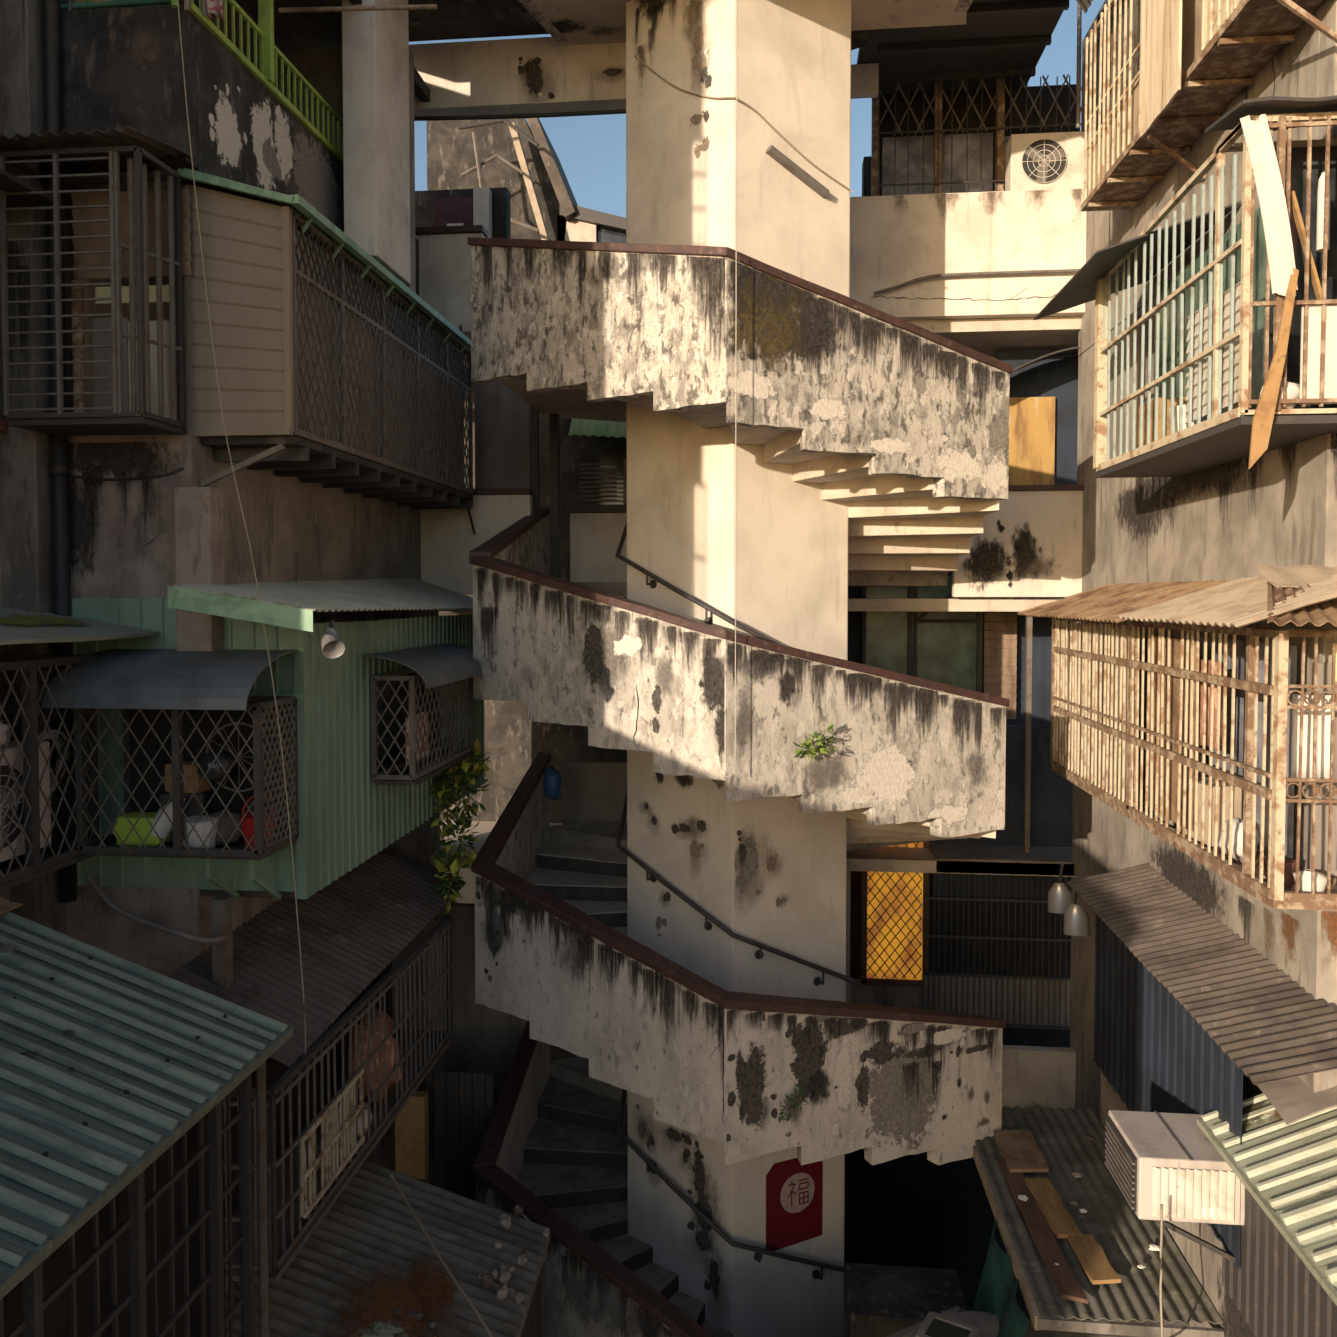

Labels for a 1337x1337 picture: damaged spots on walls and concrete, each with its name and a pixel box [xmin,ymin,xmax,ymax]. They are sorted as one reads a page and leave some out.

damp [635,0,676,77]
peeling [208,84,344,231]
damp [480,246,533,291]
damp [552,250,1005,406]
crack [870,287,1056,301]
damp [68,442,170,575]
damp [963,520,1053,589]
damp [475,568,1004,783]
damp [804,758,855,796]
rust [1151,846,1298,958]
damp [476,876,999,1065]
rust [1242,1102,1282,1130]